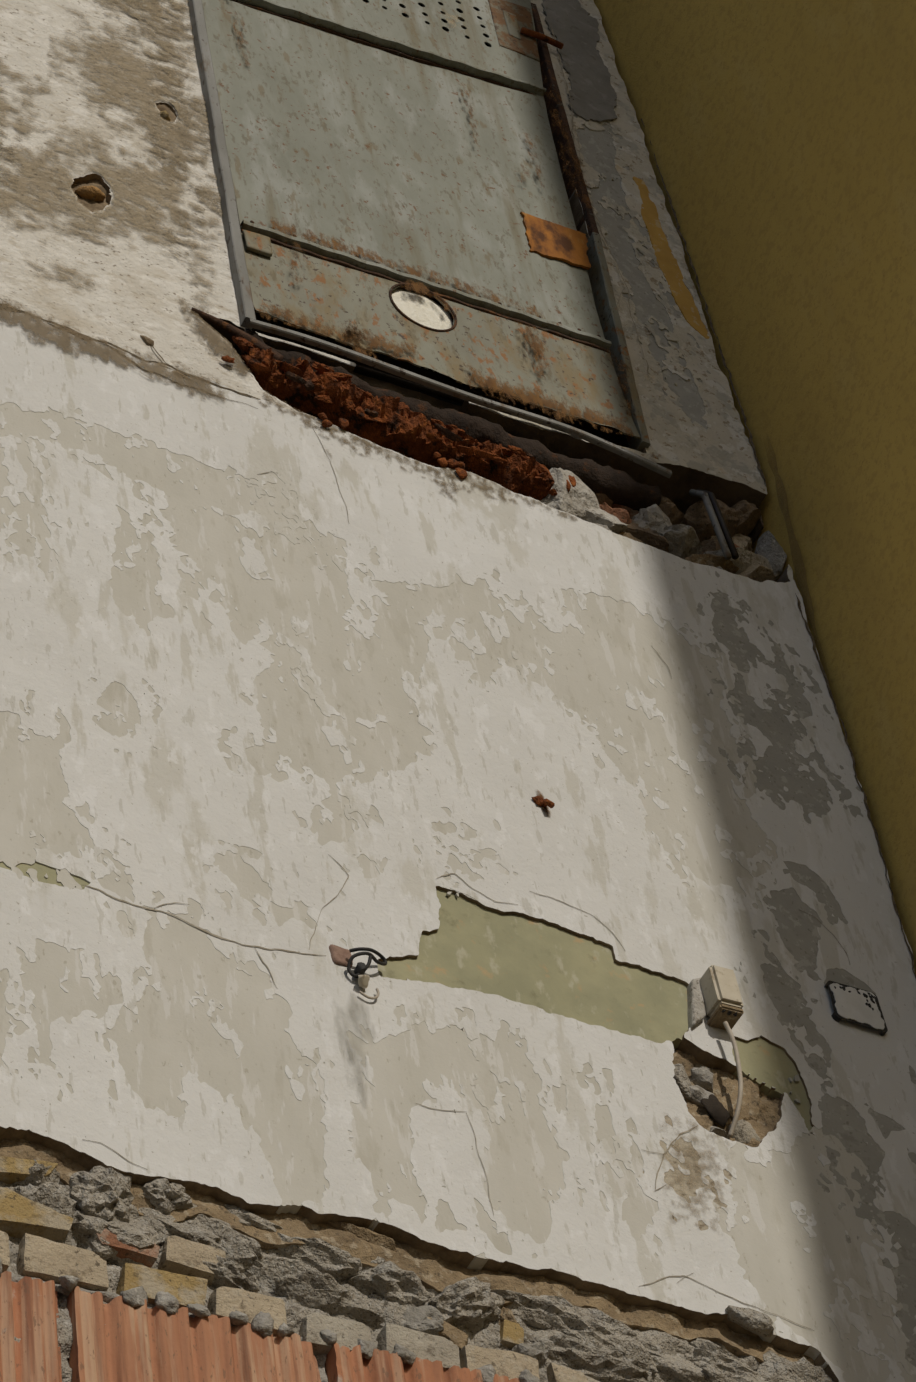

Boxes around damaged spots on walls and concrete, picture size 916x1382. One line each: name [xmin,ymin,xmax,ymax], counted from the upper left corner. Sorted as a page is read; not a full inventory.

flaking render [0,0,223,305]
corrosion [181,304,576,519]
corrosion [270,220,636,436]
crack [0,857,349,989]
peeling [0,402,916,1382]